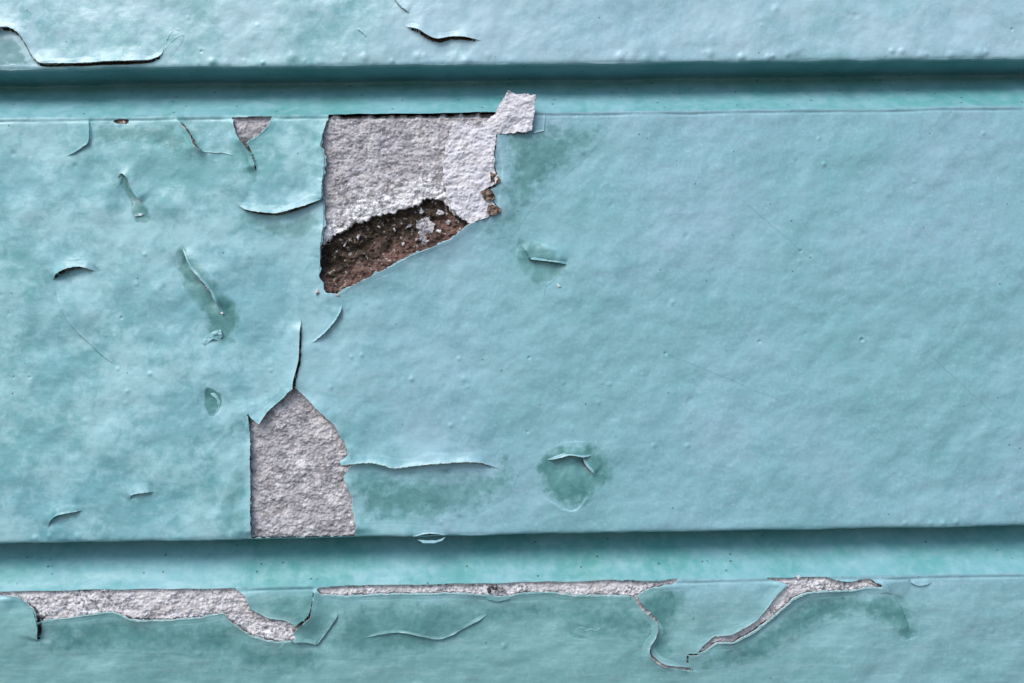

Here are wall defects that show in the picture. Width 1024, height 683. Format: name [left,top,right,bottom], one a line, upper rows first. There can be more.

peeling [66,117,275,182]
peeling [236,90,613,343]
crack [289,319,302,390]
peeling [217,386,520,543]
peeling [0,579,677,675]
peeling [694,575,919,670]